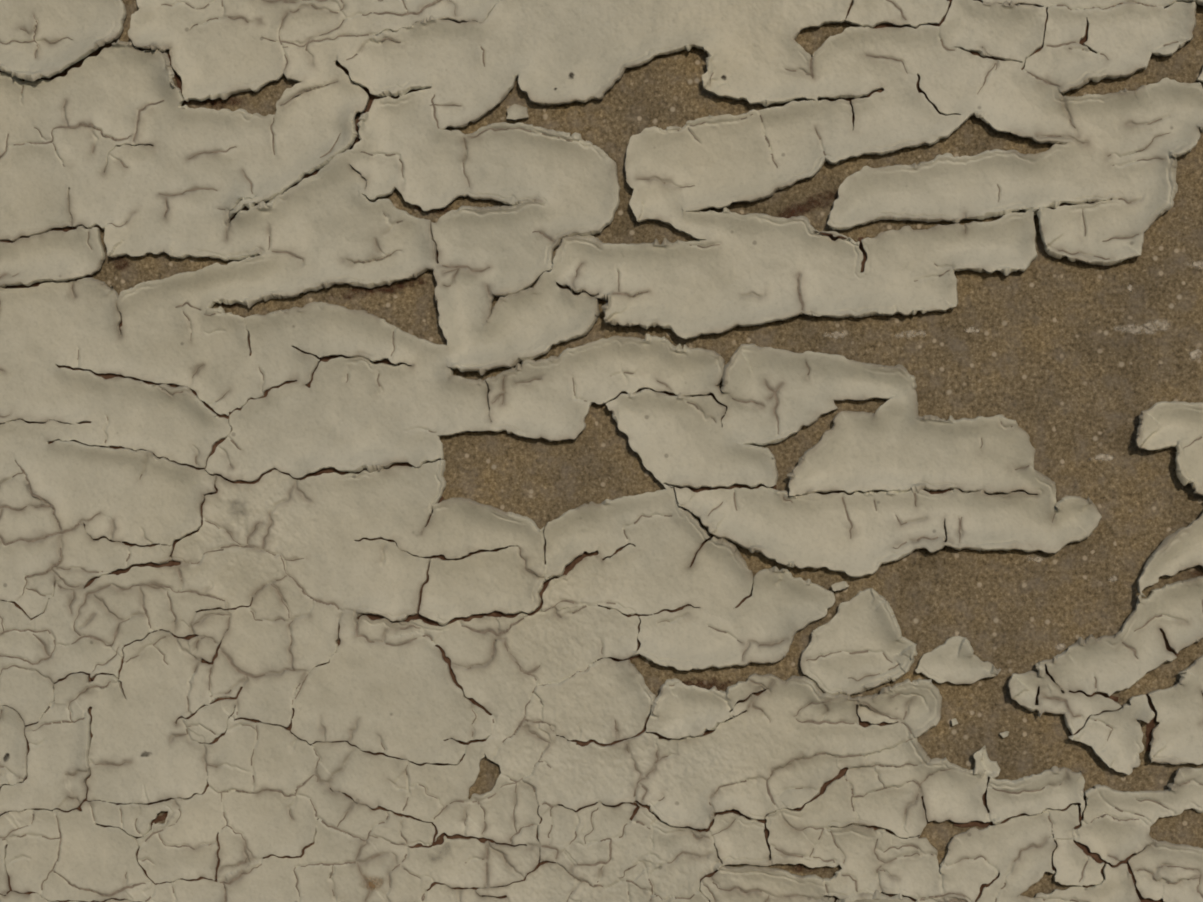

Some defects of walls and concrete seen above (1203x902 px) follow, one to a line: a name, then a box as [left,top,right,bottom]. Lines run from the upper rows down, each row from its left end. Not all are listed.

peeling [0,15,73,58]
peeling [21,0,338,155]
peeling [285,133,341,192]
peeling [0,221,244,296]
peeling [175,270,451,393]
peeling [347,0,1203,902]
crack [0,346,794,902]
crack [796,705,855,725]